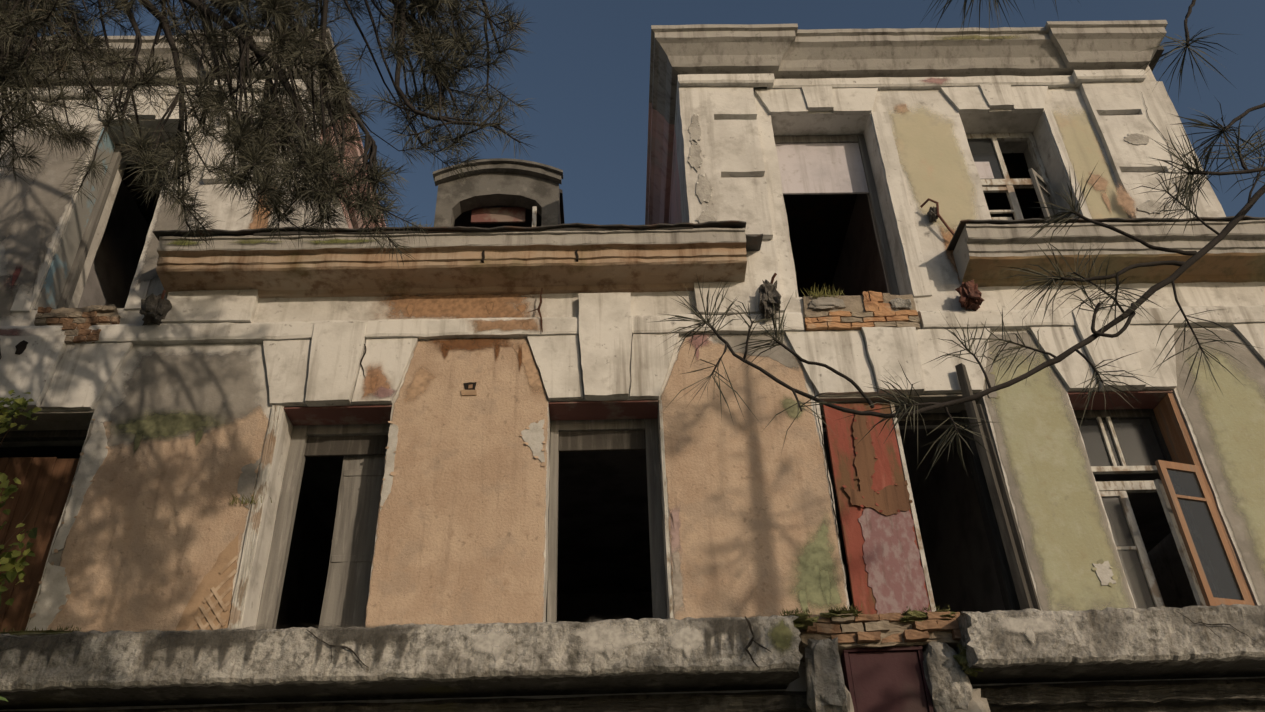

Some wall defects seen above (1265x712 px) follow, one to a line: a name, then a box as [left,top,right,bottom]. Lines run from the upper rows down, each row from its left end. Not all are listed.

crack [1141,92,1196,200]
flaking render [34,304,121,345]
flaking render [802,291,920,331]
spalling [15,340,28,355]
flaking render [380,421,398,511]
peeling [843,480,912,516]
flaking render [26,419,110,631]
flaking render [1092,559,1118,586]
damp [0,632,86,666]
damp [144,626,255,667]
damp [316,625,413,665]
crack [745,616,772,667]